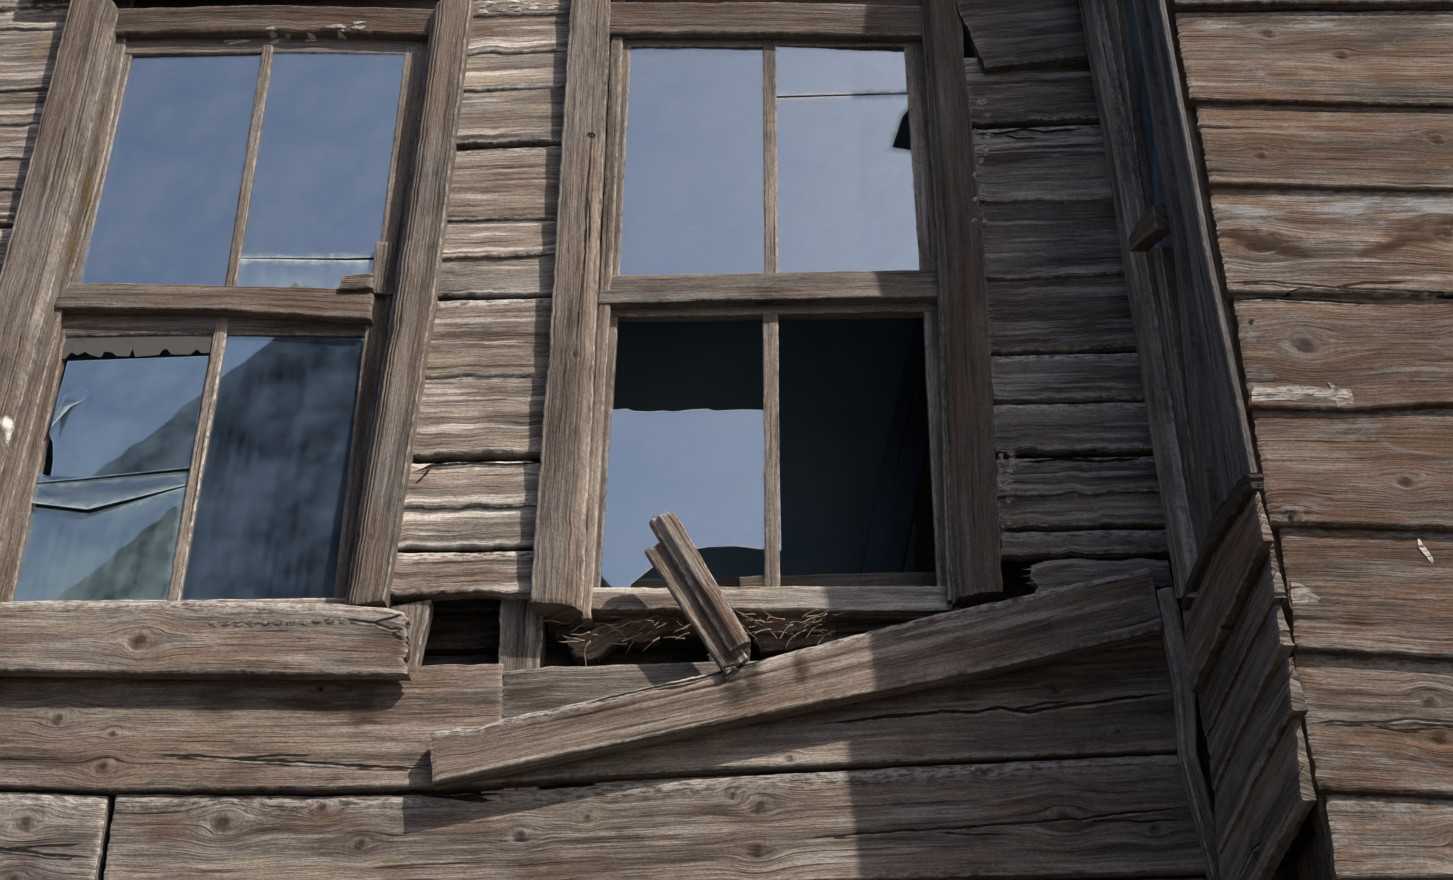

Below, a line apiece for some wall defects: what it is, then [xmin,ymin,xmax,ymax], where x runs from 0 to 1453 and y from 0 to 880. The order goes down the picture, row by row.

crack [815,686,1175,725]
crack [161,753,498,805]
crack [0,843,95,859]